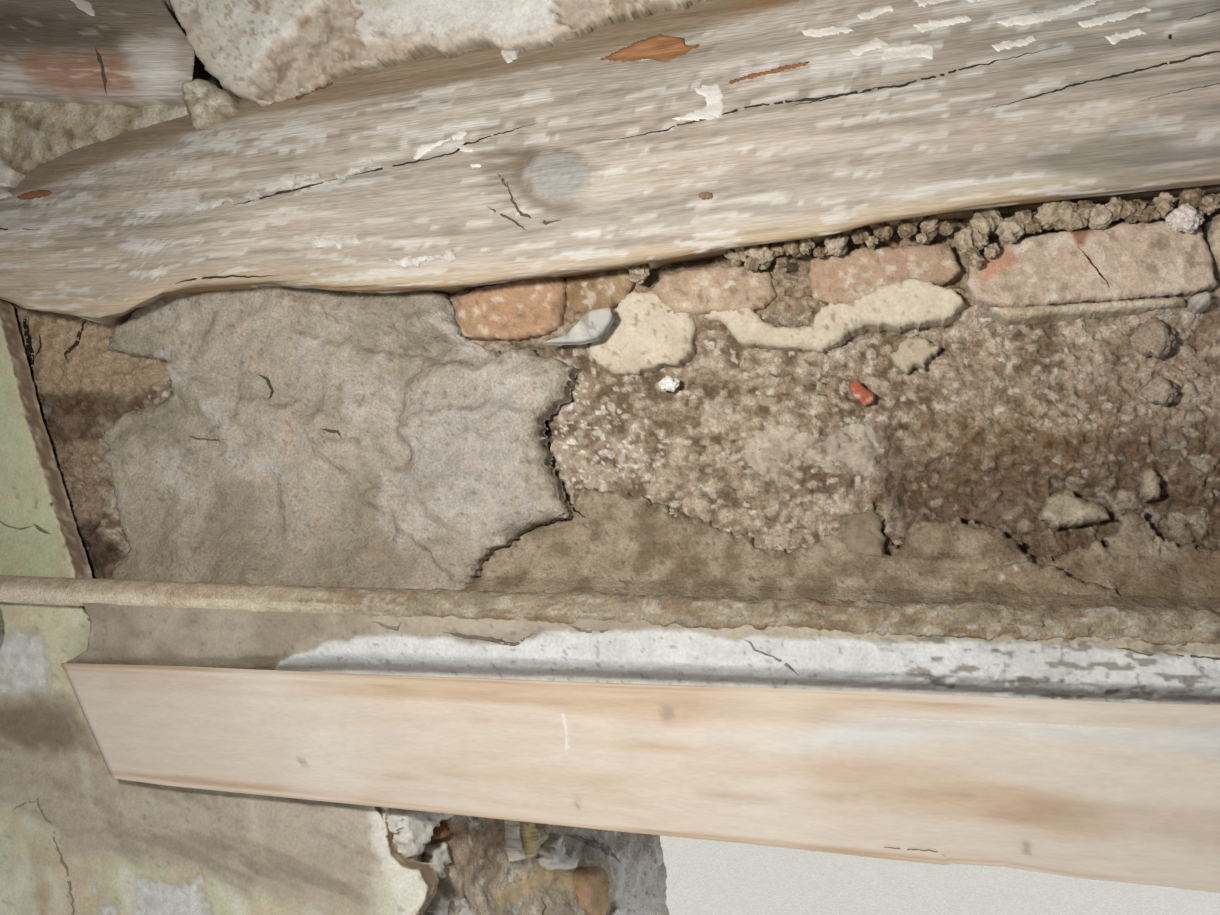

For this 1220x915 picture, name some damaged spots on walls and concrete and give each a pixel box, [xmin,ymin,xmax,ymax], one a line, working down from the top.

crack [544,420,552,451]
crack [0,521,50,534]
crack [13,798,75,915]
peeling [133,875,211,915]